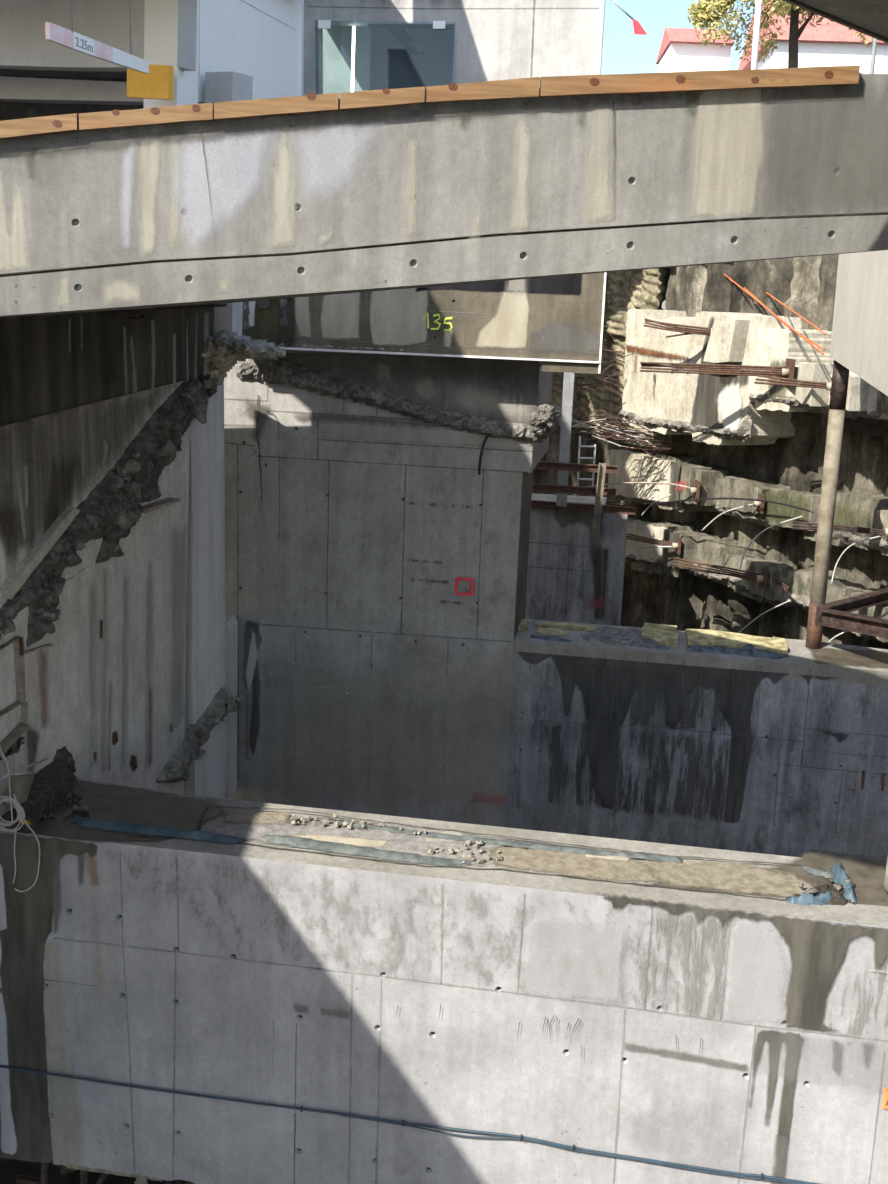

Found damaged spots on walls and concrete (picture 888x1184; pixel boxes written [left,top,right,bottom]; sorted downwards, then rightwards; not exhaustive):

spalling [113,304,227,321]
spalling [845,410,888,421]
spalling [0,330,829,647]
spalling [832,531,888,550]
leakage [802,648,888,683]
spalling [155,686,242,783]
leakage [519,652,788,823]
leakage [822,731,848,742]
leakage [762,850,888,906]
leakage [0,778,224,1163]
leakage [604,881,888,1184]